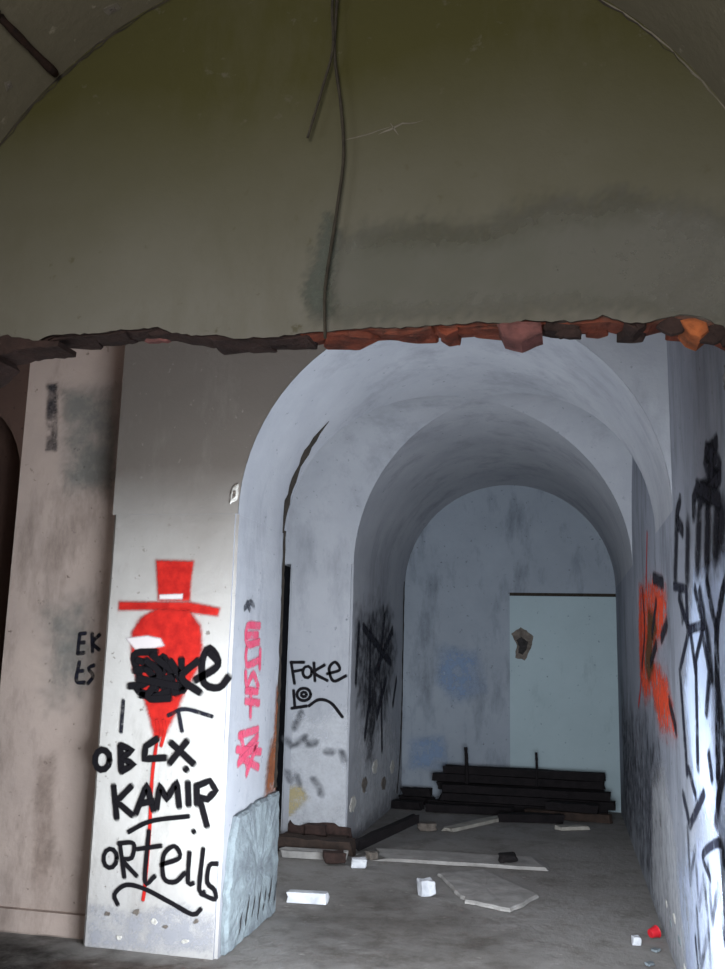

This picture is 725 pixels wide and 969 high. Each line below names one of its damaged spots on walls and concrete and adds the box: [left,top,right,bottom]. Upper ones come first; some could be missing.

leakage [305,194,725,320]
flaking render [0,315,725,388]
spalling [230,484,239,504]
spalling [512,627,533,661]